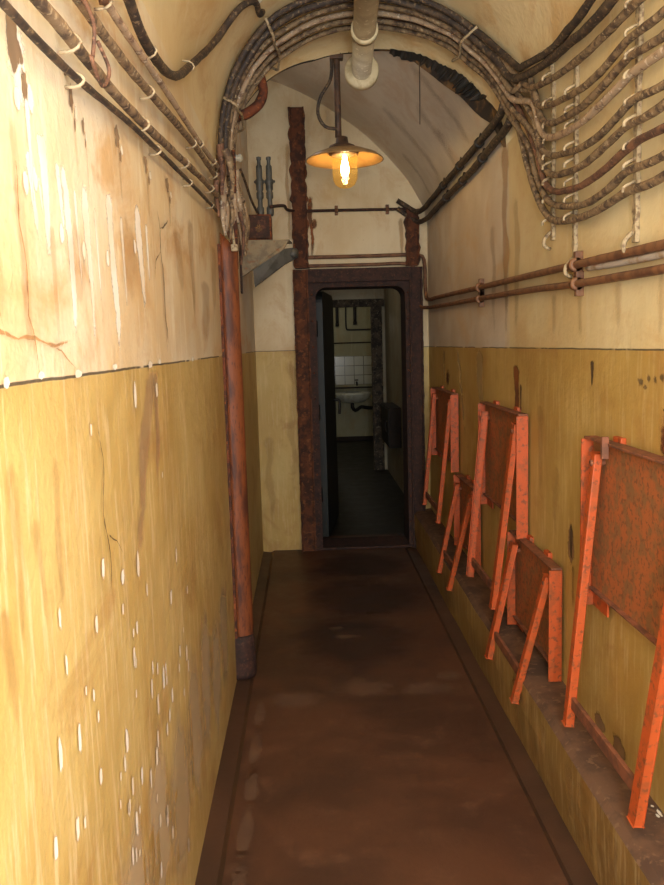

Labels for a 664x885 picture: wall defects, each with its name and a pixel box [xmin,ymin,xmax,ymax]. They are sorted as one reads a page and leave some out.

crack [0,167,73,365]
damp [23,134,150,345]
peeling [120,660,174,838]